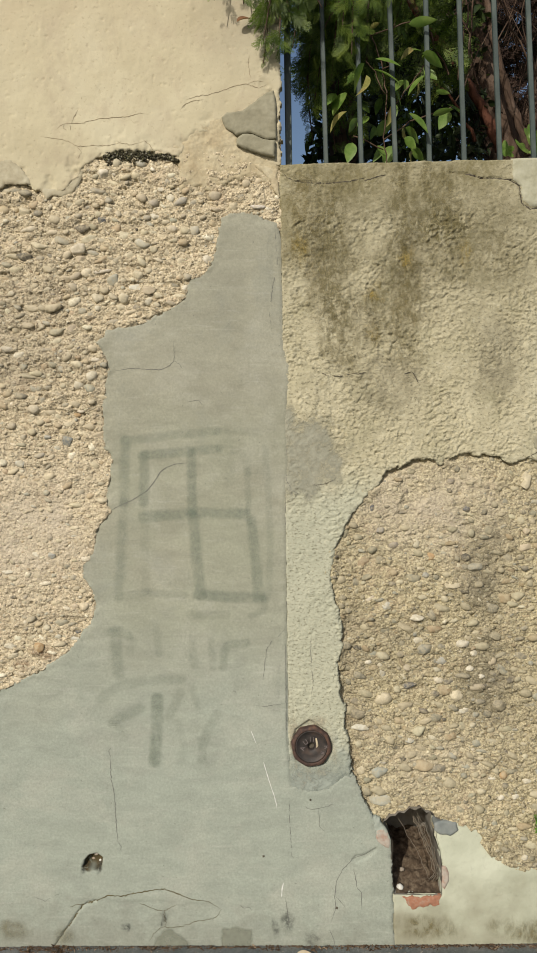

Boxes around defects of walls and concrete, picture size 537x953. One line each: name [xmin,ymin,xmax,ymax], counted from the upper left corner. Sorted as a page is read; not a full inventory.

crack [40,97,152,158]
damp [393,167,461,277]
crack [449,171,537,210]
spalling [0,90,281,690]
spalling [325,435,537,872]
crack [38,888,251,945]